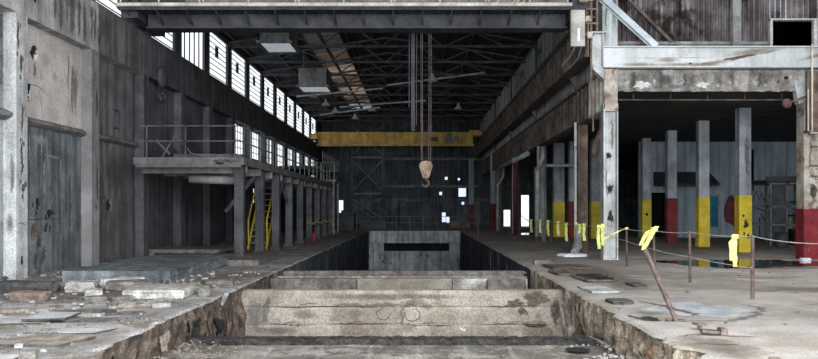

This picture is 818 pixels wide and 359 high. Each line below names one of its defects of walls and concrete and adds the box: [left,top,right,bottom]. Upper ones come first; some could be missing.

spalling [17,23,51,268]
water stain [67,58,77,113]
corrosion [661,50,771,86]
spalling [102,231,369,359]
spalling [460,231,707,359]